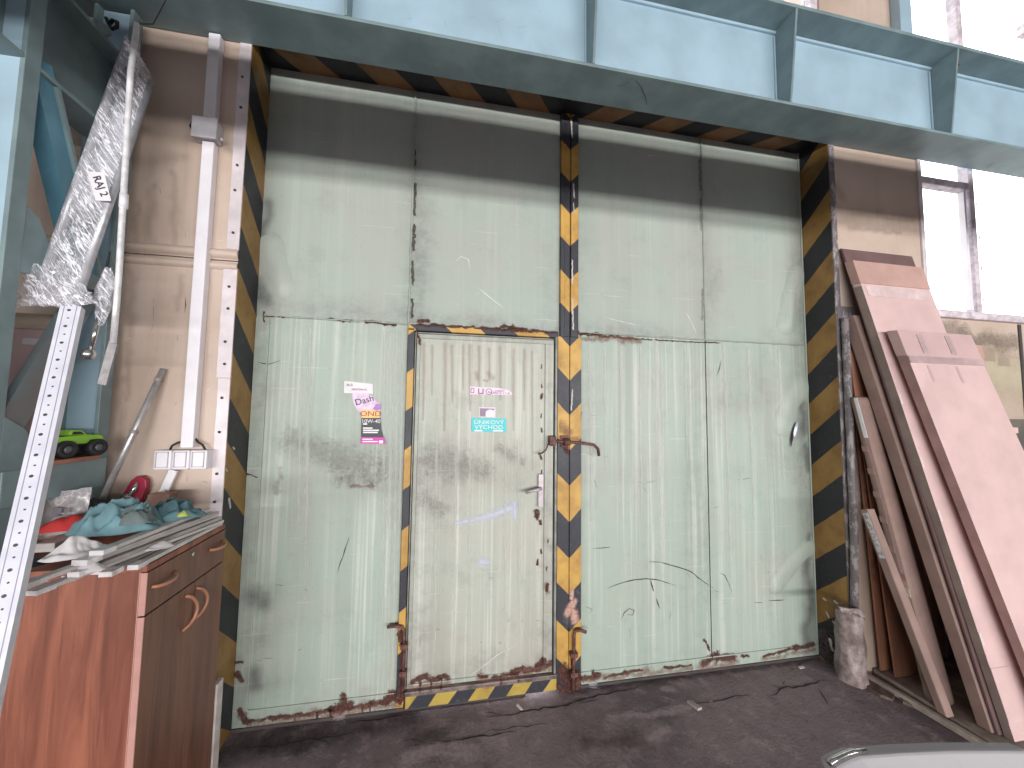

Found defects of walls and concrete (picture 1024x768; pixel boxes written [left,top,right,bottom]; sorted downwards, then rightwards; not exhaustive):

corrosion [416,319,558,345]
corrosion [577,331,718,344]
corrosion [763,642,815,659]
corrosion [237,630,450,726]
corrosion [477,639,749,693]
crack [770,680,829,706]
crack [243,685,646,749]